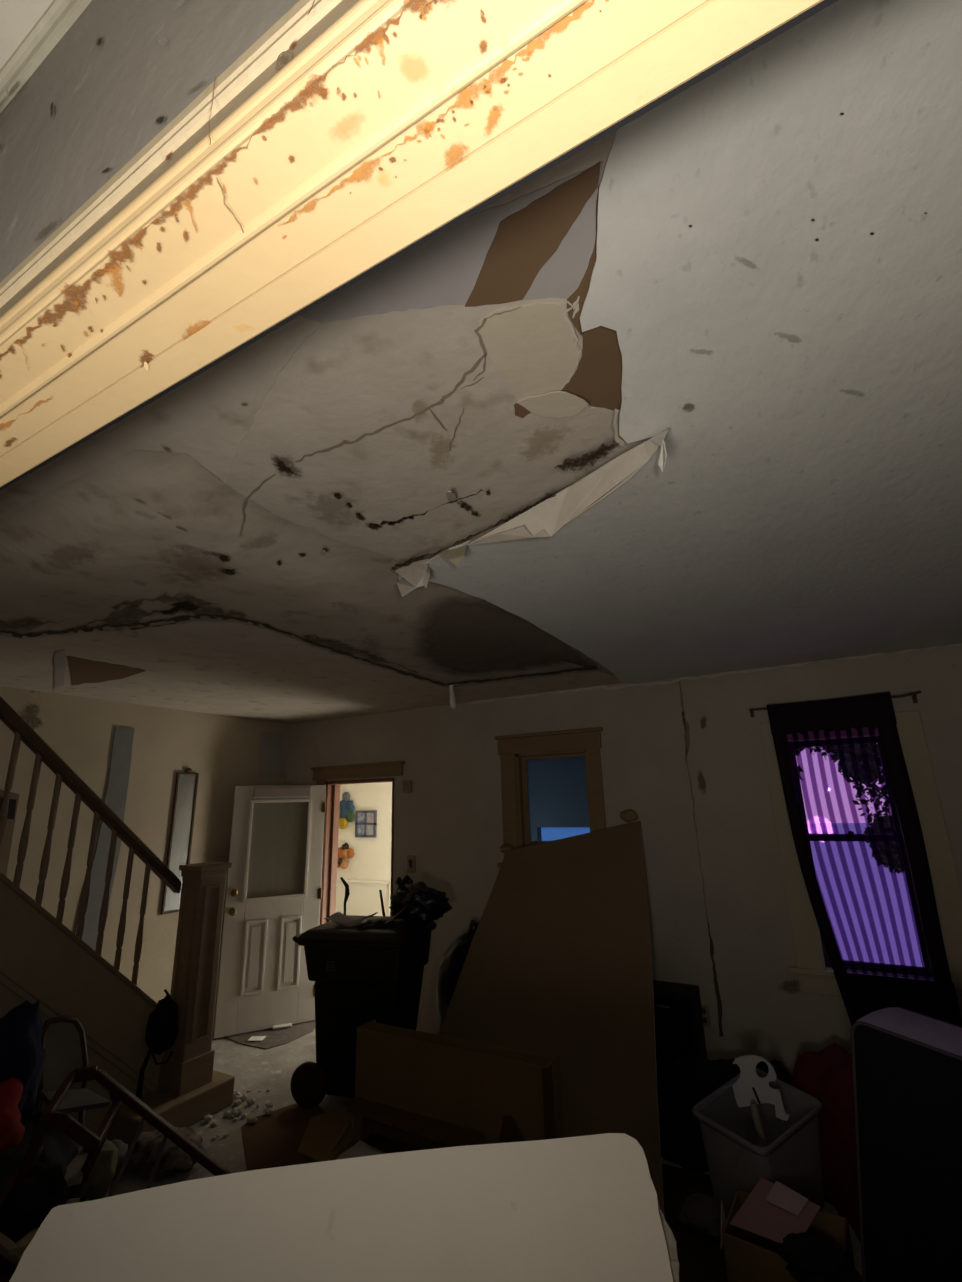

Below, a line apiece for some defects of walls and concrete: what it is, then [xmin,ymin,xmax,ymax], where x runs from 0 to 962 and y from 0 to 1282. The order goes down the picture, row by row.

corrosion [0,0,444,364]
corrosion [283,0,609,238]
corrosion [0,399,50,447]
corrosion [140,351,154,371]
water stain [220,555,236,575]
crack [239,306,521,537]
peeling [226,161,621,548]
water stain [334,443,619,570]
crack [679,681,724,1037]